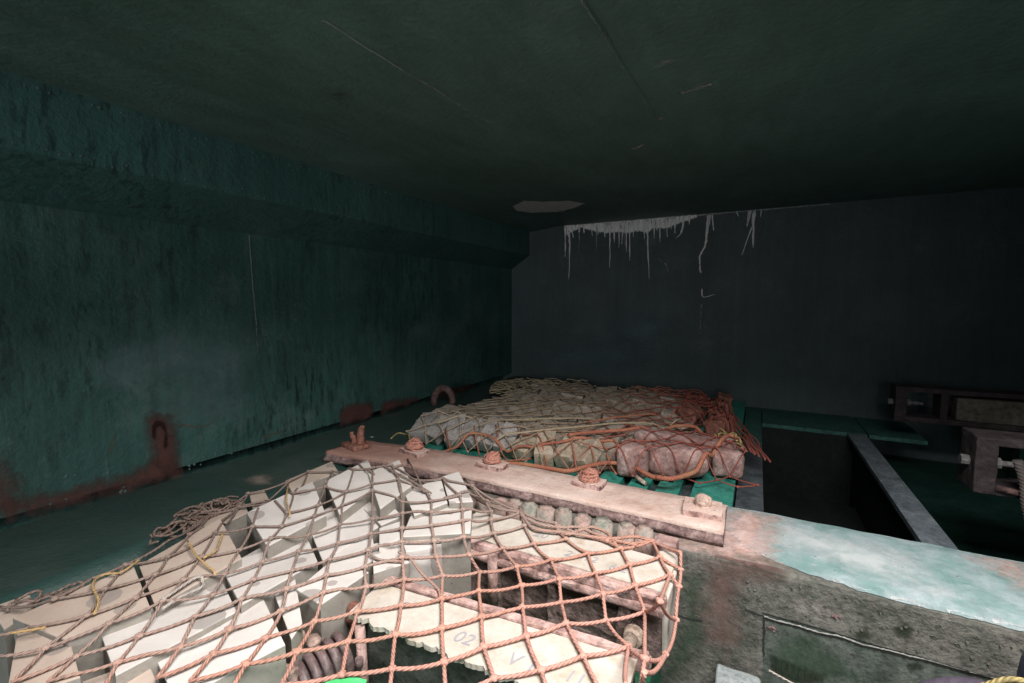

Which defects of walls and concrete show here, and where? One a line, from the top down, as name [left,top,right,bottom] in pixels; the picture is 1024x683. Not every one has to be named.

efflorescence [564,215,714,277]
rust [5,415,178,515]